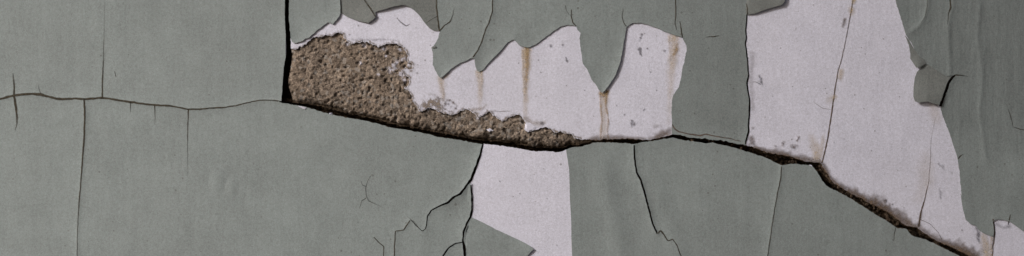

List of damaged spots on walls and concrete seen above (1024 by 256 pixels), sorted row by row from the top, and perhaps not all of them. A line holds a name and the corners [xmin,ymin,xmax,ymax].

crack [0,49,282,216]
peeling [282,0,687,256]
crack [281,0,968,256]
peeling [743,0,1024,256]